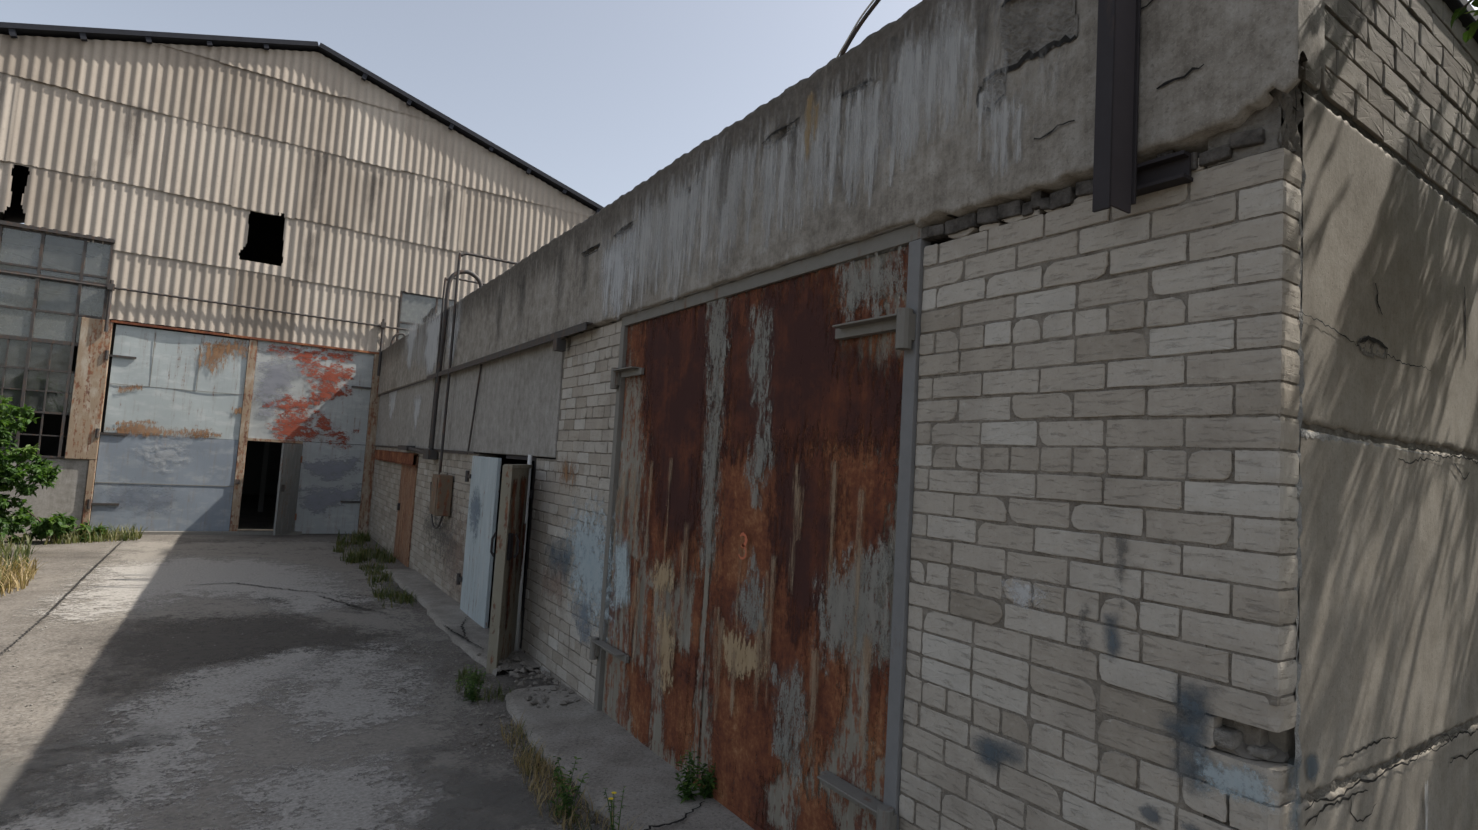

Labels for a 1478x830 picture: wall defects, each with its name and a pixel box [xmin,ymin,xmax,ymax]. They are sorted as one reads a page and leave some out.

spalling [976,0,1078,112]
leakage [602,23,1021,317]
crack [1299,311,1431,371]
crack [1461,287,1469,360]
crack [1399,447,1478,480]
corrosion [611,245,909,830]
crack [1305,728,1478,826]